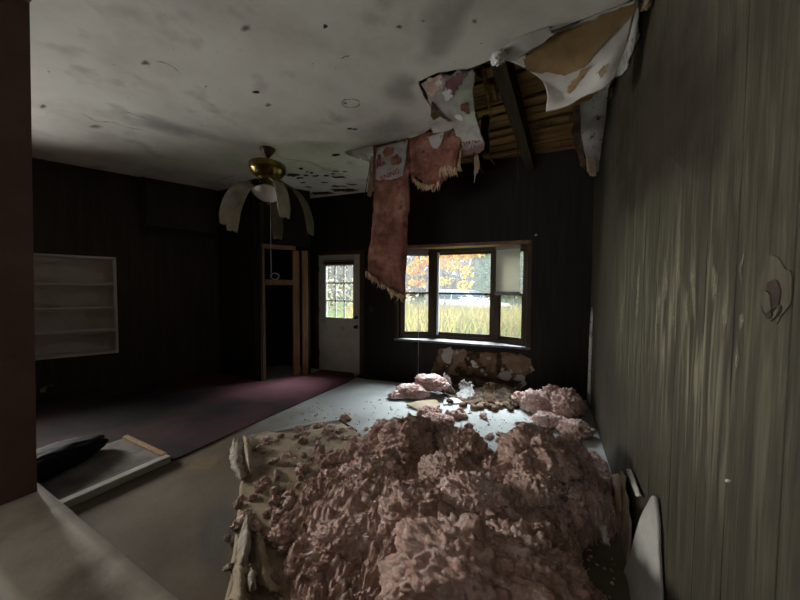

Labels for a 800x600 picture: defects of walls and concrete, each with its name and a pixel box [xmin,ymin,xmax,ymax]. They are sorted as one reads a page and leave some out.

peeling [499,2,641,102]
leakage [287,168,358,197]
peeling [760,255,793,324]
peeling [430,347,534,391]